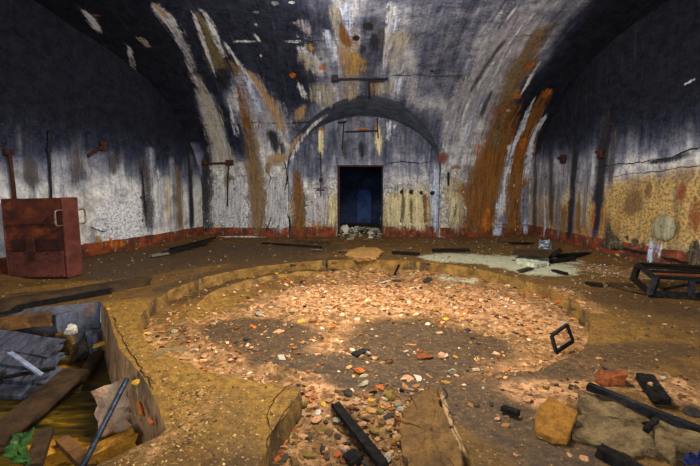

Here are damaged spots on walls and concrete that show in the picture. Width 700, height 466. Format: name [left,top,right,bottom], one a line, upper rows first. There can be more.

rust [338,47,365,99]
rust [230,61,269,231]
rust [291,172,321,233]
rust [457,23,557,236]
leakage [520,105,618,239]
leakage [625,182,652,216]
crack [605,147,700,178]
rust [96,237,125,247]
crack [113,317,156,391]